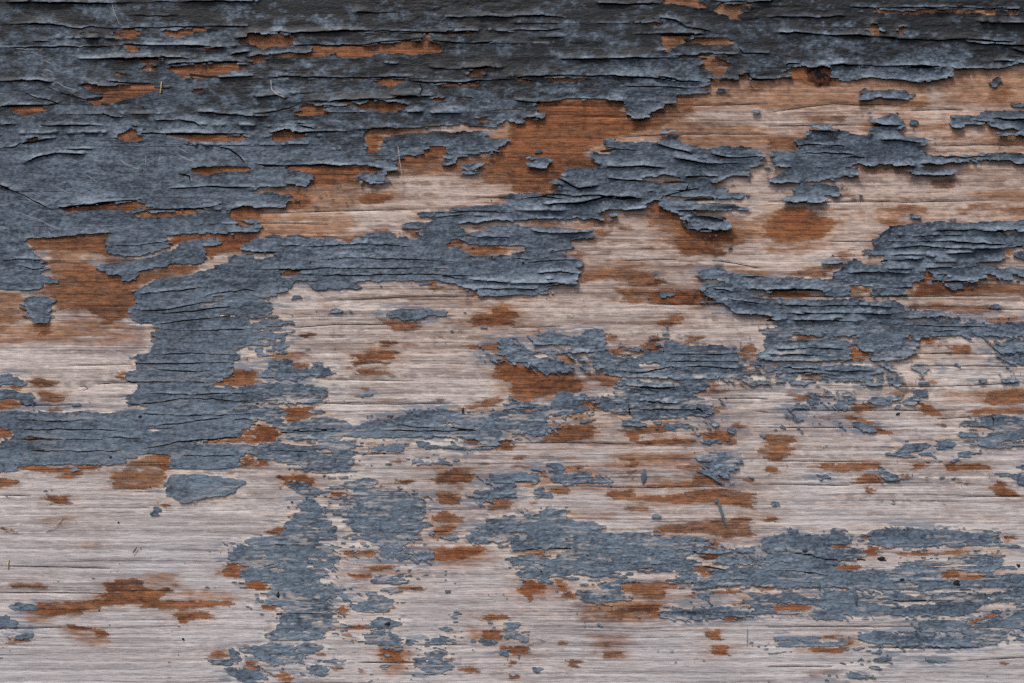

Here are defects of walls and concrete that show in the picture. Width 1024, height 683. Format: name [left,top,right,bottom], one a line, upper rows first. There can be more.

peeling [0,0,1024,323]
crack [0,0,1024,457]
peeling [0,112,1024,485]
peeling [0,602,51,658]
peeling [163,474,246,503]
peeling [207,477,434,683]
peeling [408,626,456,675]
peeling [465,506,1024,679]